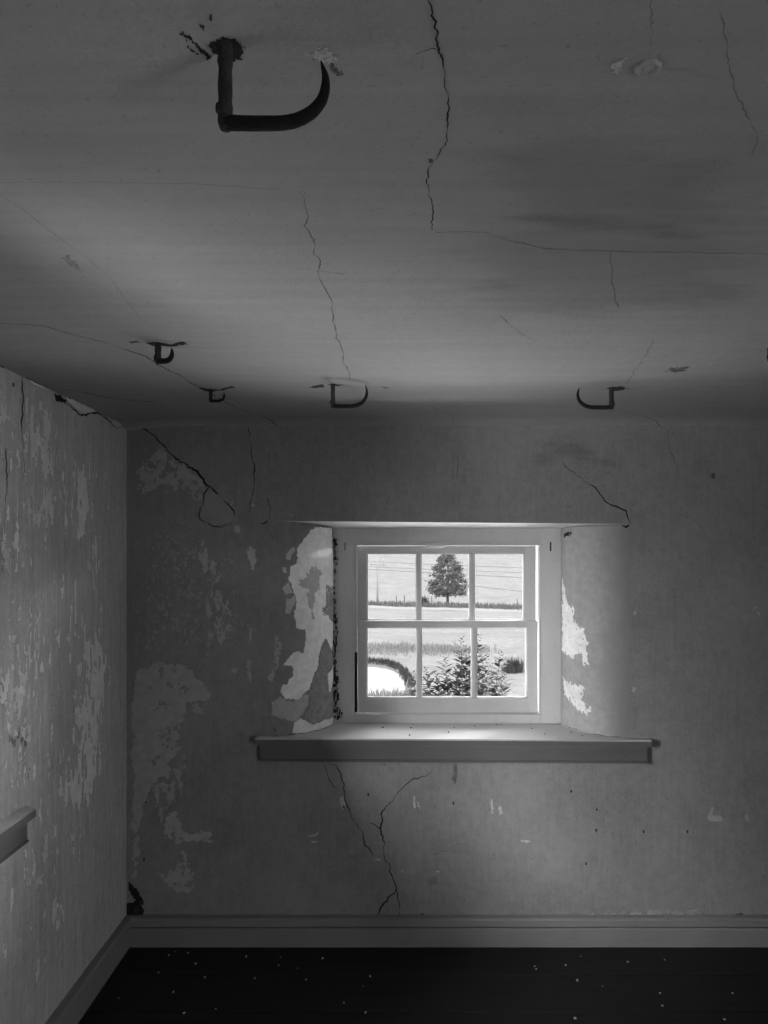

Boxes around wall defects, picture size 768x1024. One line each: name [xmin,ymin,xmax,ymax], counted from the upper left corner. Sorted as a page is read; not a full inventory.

crack [416,0,450,233]
crack [303,192,350,382]
crack [1,323,331,528]
crack [562,462,630,523]
peeling [0,380,111,983]
peeling [268,527,334,734]
peeling [561,525,636,737]
peeling [126,660,213,915]
crack [324,764,433,915]